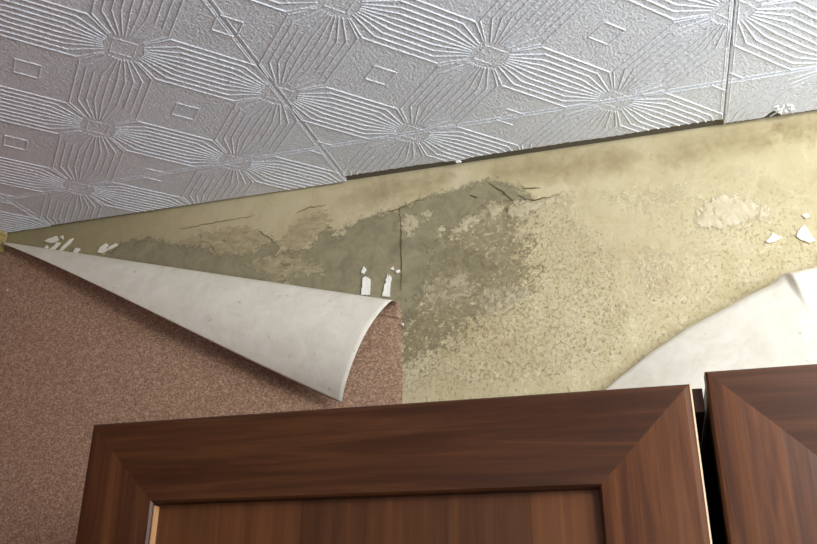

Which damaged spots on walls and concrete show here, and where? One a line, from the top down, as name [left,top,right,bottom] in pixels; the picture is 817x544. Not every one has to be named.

peeling [44,235,80,253]
peeling [97,243,118,254]
spalling [178,210,347,282]
crack [384,198,425,279]
spalling [695,192,771,232]
peeling [797,213,816,243]
leakage [105,178,544,369]